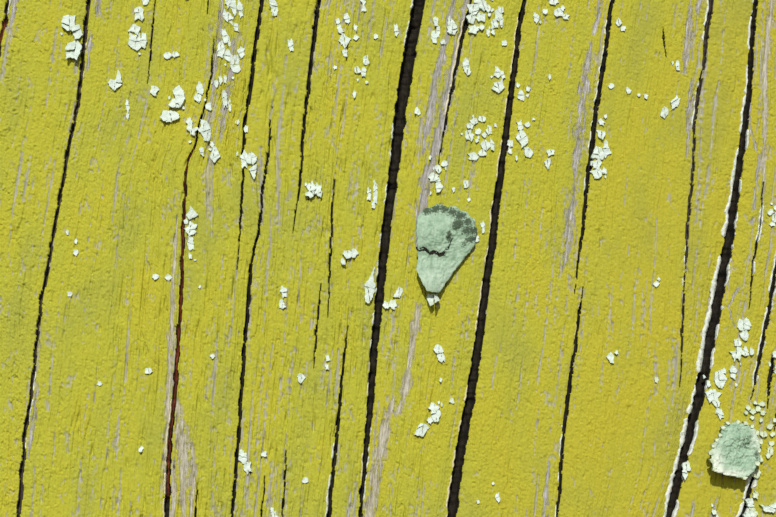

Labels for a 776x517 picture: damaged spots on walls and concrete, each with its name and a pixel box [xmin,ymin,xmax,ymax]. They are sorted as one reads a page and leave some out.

crack [16,0,91,517]
peeling [60,15,93,70]
peeling [128,0,150,55]
peeling [160,0,249,164]
crack [231,0,271,517]
crack [358,0,425,517]
peeling [364,0,507,517]
crack [446,0,527,517]
crack [555,0,615,517]
peeling [589,114,612,179]
crack [663,0,758,517]
peeling [702,287,776,480]